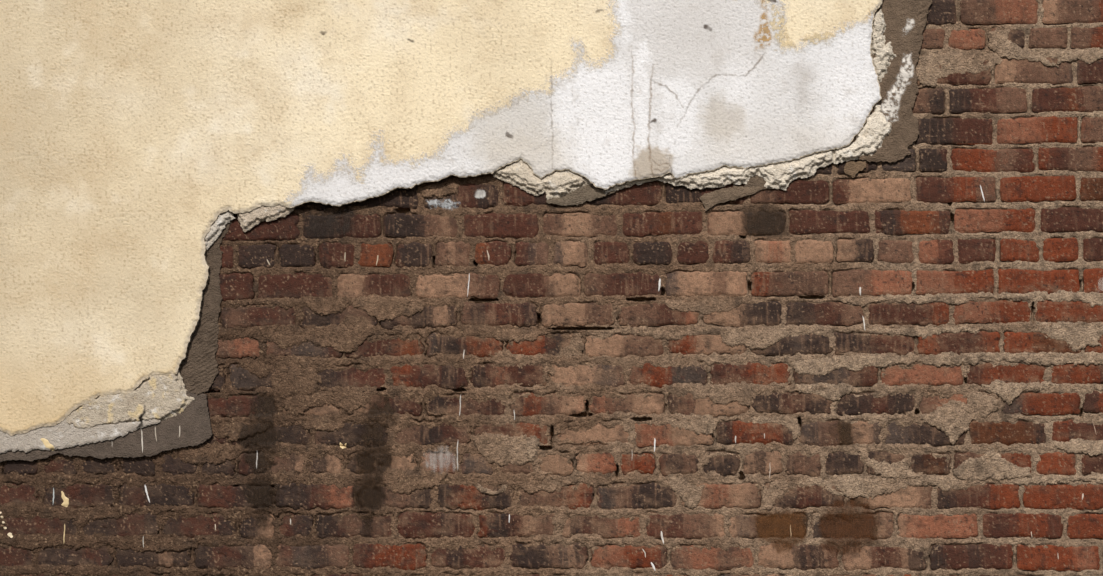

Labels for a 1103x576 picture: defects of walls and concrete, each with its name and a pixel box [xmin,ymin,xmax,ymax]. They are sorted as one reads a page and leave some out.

peeling [205,0,896,250]